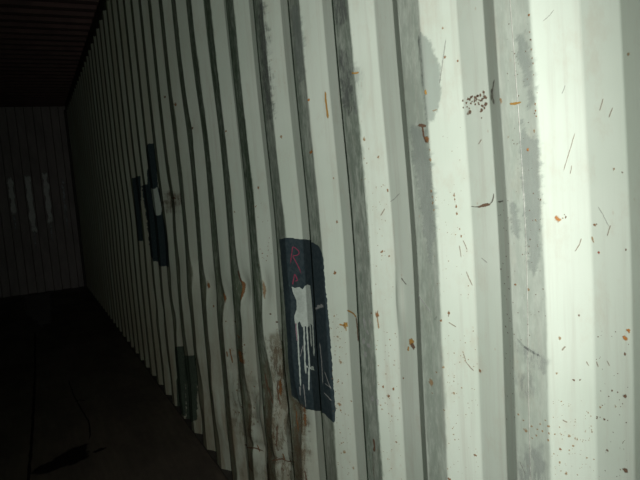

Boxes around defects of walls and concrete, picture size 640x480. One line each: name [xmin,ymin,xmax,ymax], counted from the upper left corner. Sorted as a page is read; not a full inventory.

rust [263,343,285,480]